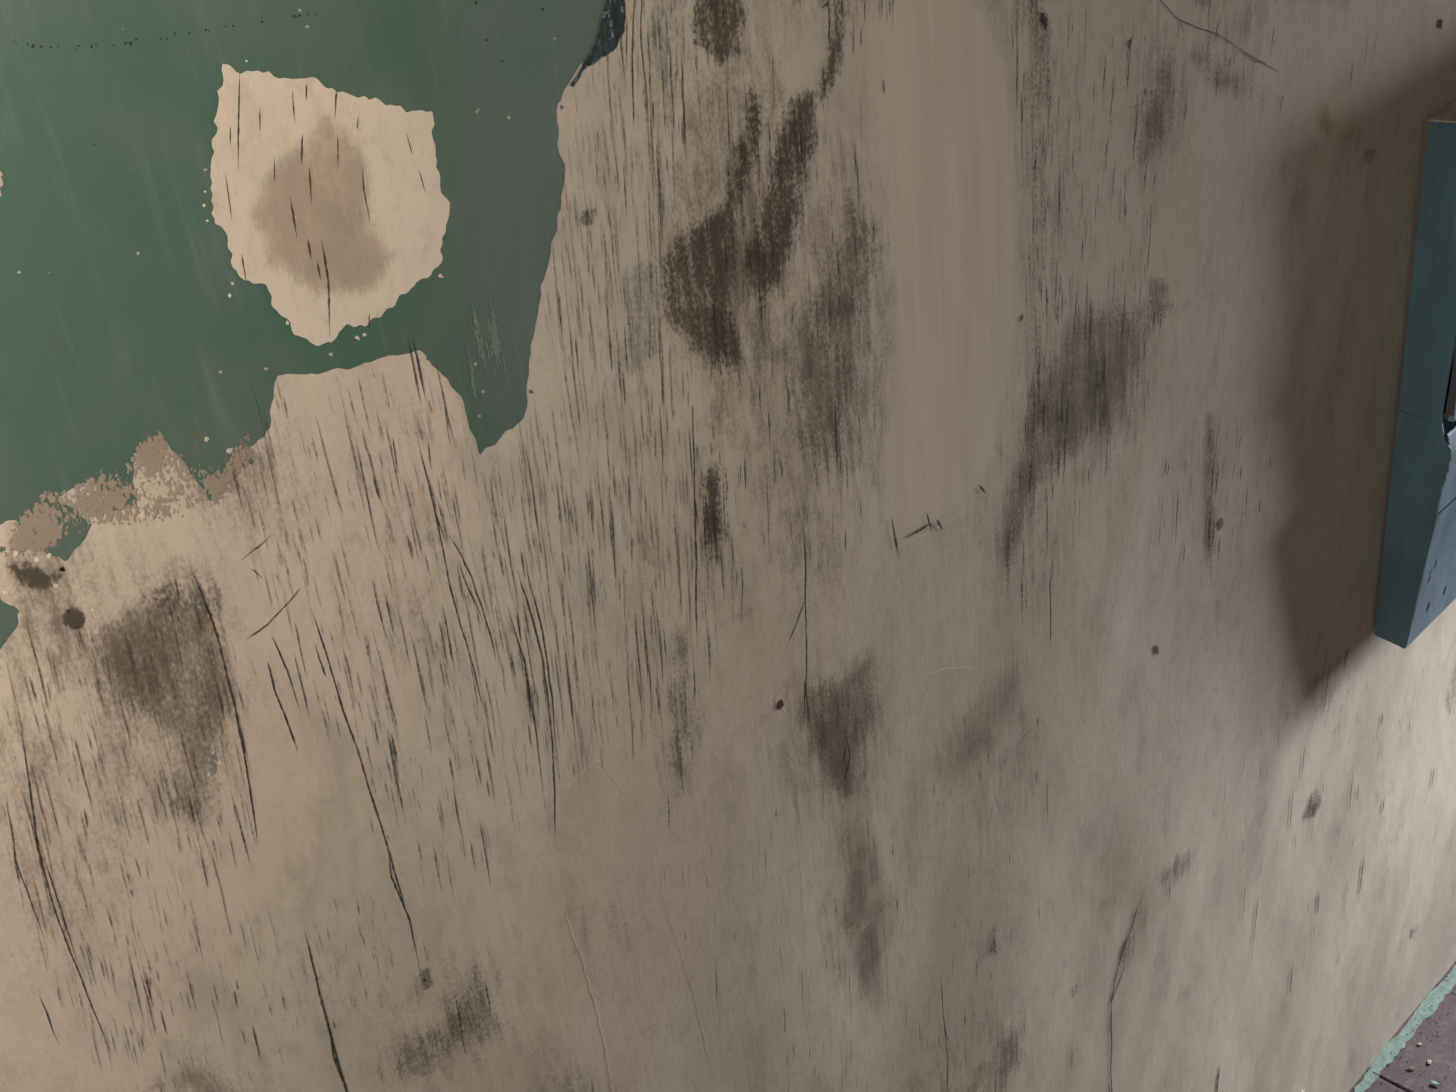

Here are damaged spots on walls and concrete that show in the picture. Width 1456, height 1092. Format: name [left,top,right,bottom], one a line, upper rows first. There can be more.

peeling [0,0,626,649]
damp [662,0,844,374]
damp [1005,283,1167,609]
crack [1160,0,1284,75]
damp [107,580,219,699]
spalling [416,969,432,994]